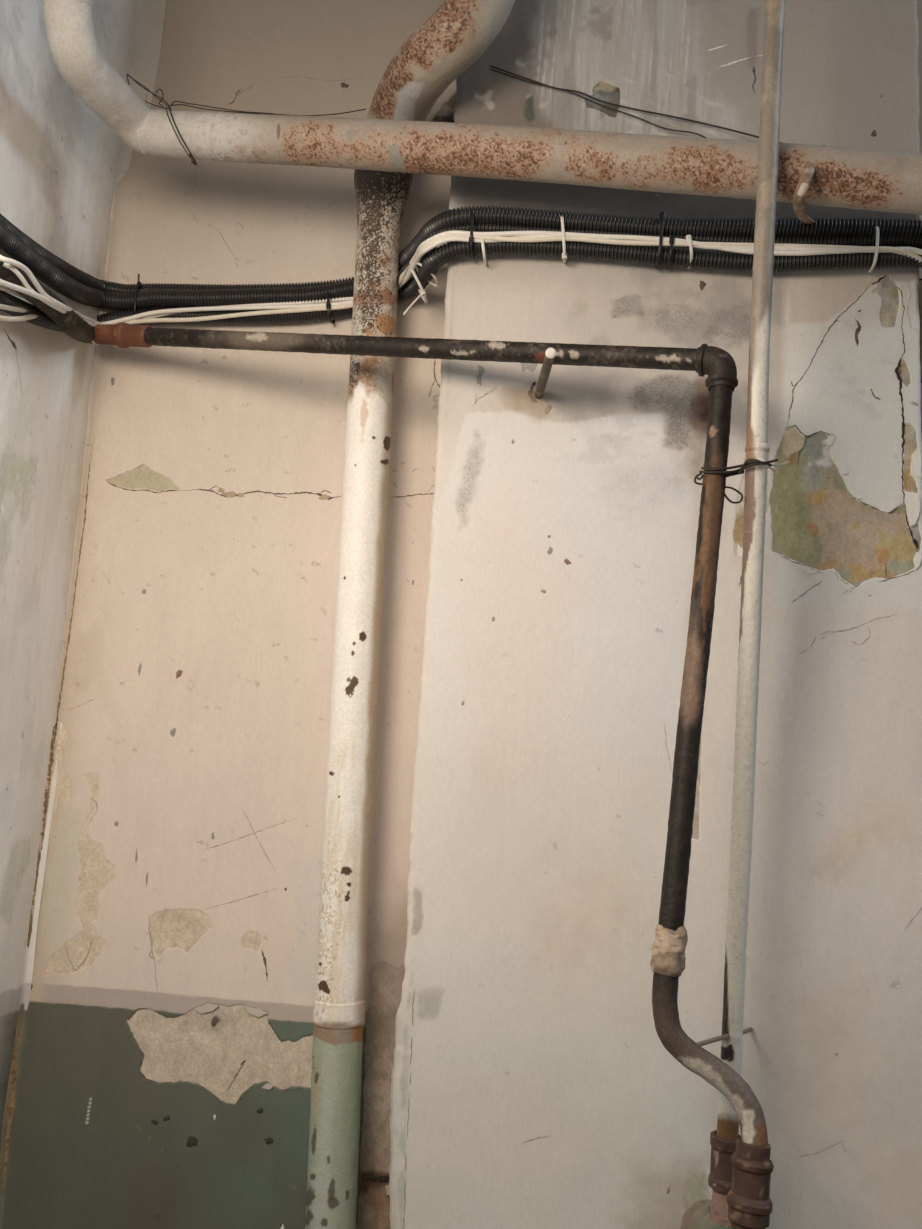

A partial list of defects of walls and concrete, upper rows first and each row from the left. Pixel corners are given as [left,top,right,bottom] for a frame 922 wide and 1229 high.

water stain [635,377,696,447]
crack [787,275,922,570]
crack [185,486,341,500]
crack [397,466,435,497]
peeling [733,469,745,557]
flaking render [766,425,917,592]
peeling [45,721,115,975]
peeling [148,909,211,991]
peeling [242,931,268,977]
flaking render [126,1003,313,1121]
flaking render [356,962,415,1229]